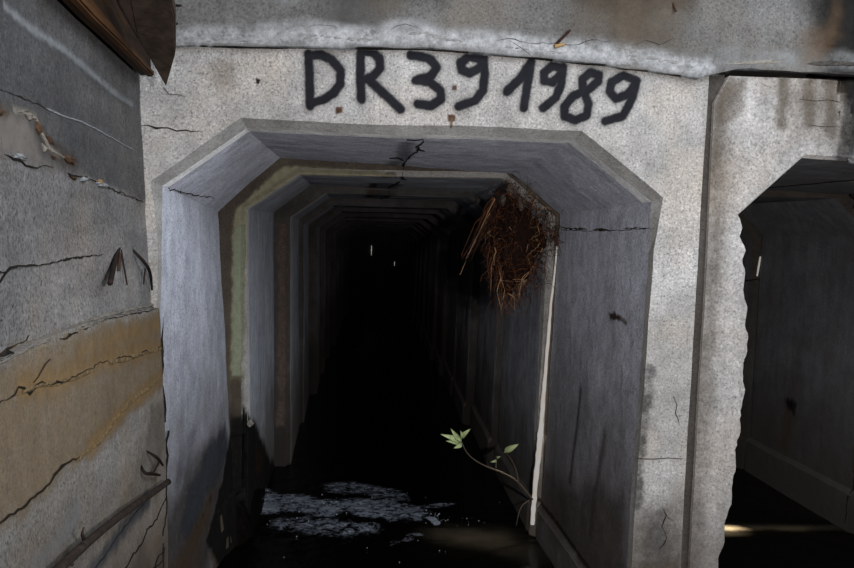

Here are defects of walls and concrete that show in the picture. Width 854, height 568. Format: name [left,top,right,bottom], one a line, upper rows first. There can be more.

spalling [0,107,111,188]
crack [0,89,134,150]
crack [141,124,202,132]
crack [368,139,425,199]
crack [0,254,102,283]
crack [0,303,170,568]